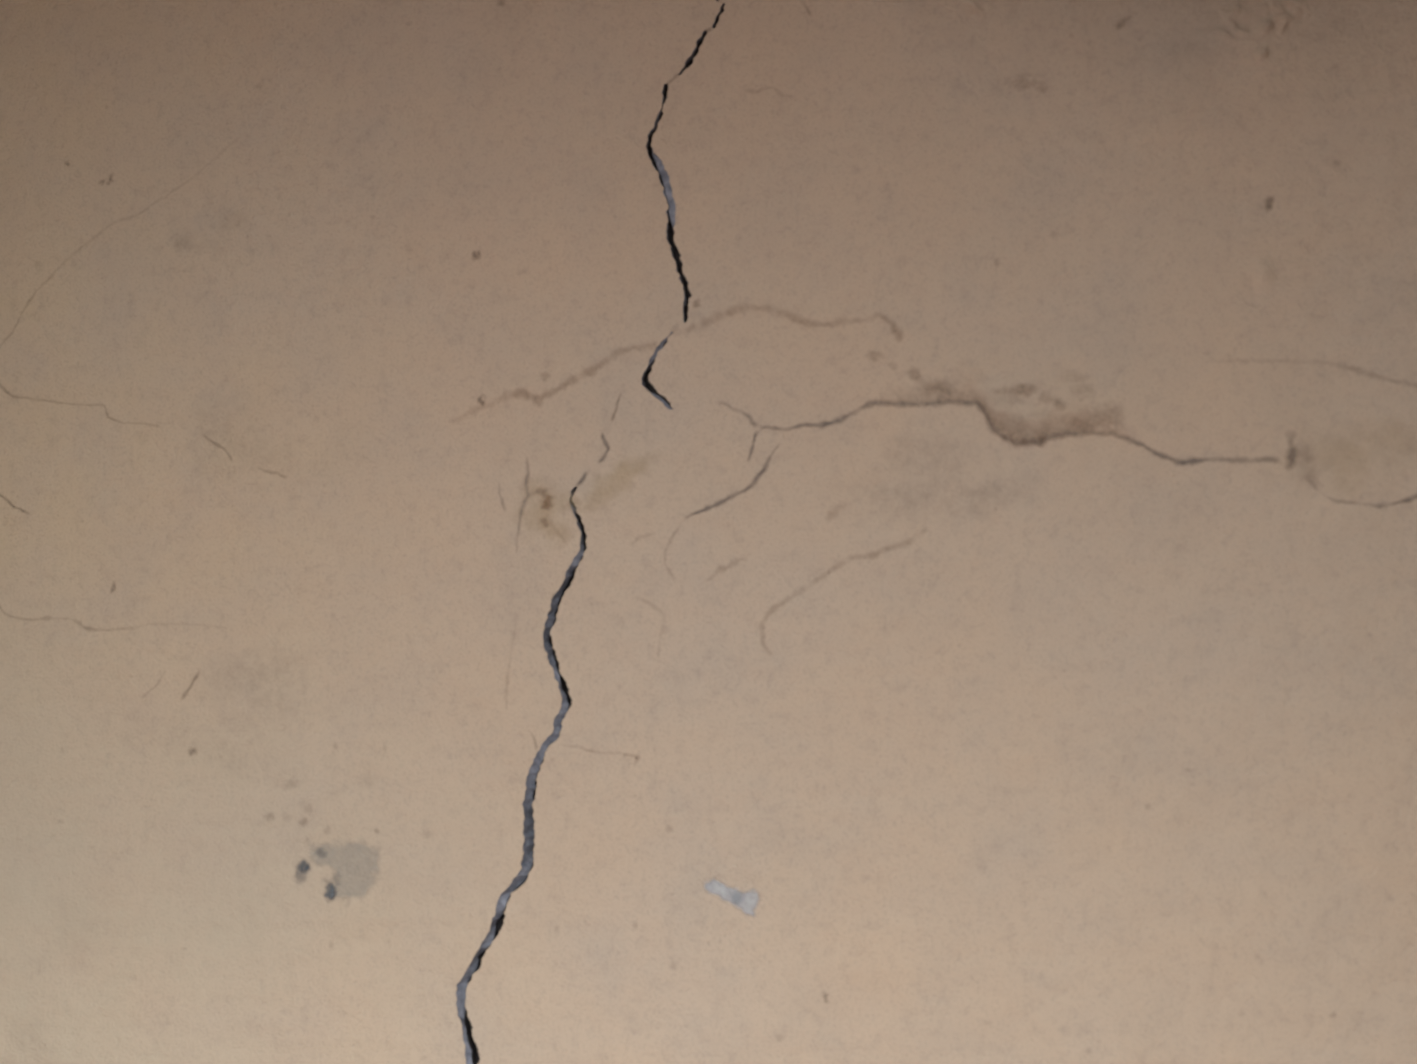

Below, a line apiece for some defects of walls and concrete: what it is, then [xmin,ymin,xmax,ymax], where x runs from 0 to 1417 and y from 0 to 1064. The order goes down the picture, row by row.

crack [641,0,725,410]
crack [456,480,587,1064]
peeling [705,880,758,915]